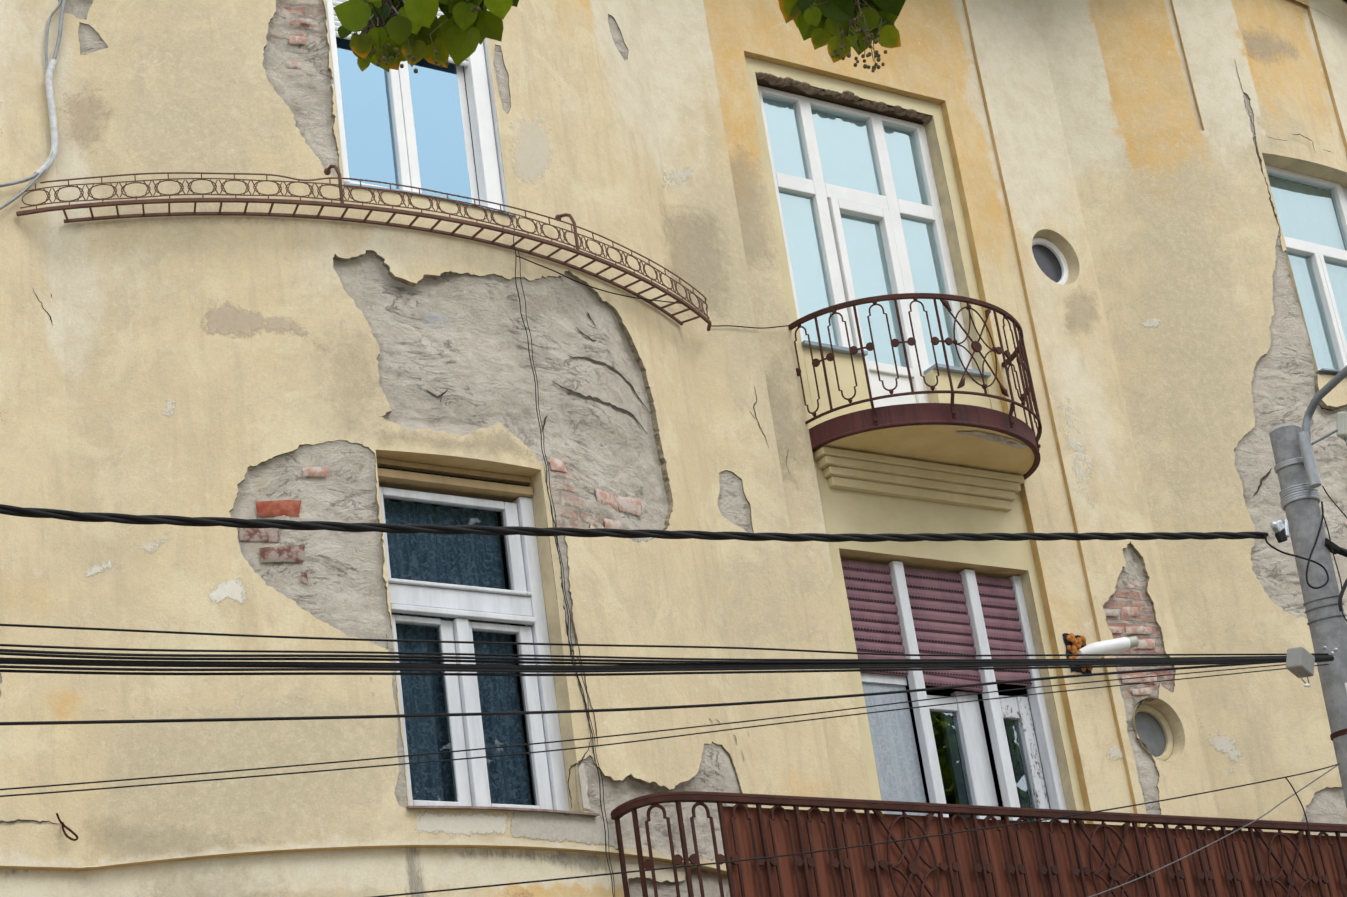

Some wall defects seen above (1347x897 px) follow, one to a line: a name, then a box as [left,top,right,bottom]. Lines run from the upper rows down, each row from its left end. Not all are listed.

spalling [262,0,340,177]
spalling [209,440,748,897]
spalling [333,250,673,647]
crack [544,467,598,807]
crack [542,311,648,434]
spalling [717,470,754,533]
spalling [1103,541,1176,815]
spalling [1233,92,1347,622]
spalling [1301,787,1347,836]